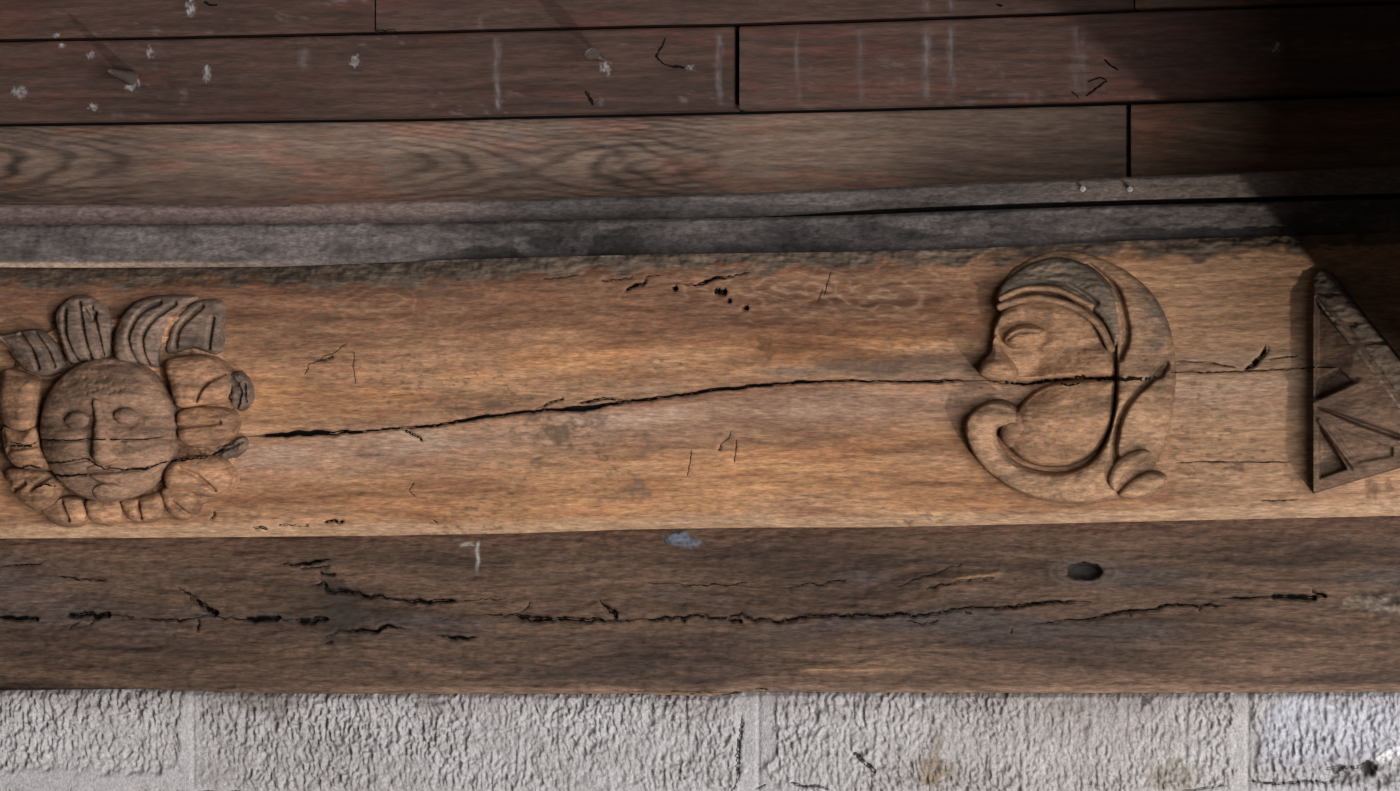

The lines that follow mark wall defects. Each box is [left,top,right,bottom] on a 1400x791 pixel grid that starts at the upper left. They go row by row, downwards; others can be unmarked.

crack [10,355,1338,490]
crack [252,519,343,530]
crack [0,559,1375,644]